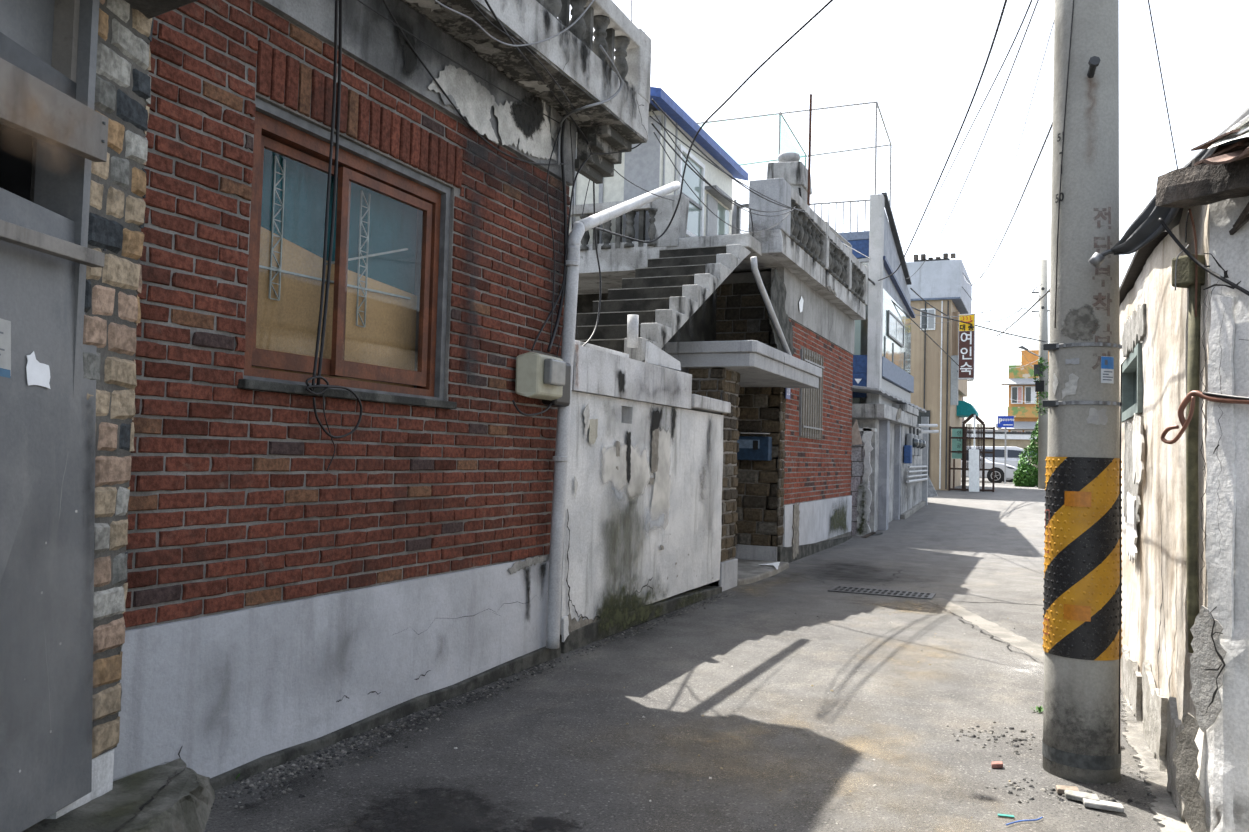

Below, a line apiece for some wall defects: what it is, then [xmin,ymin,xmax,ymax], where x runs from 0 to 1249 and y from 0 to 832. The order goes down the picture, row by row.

flaking render [403,0,630,161]
flaking render [616,431,631,483]
flaking render [650,427,659,484]
flaking render [1121,605,1227,832]
crack [113,747,184,832]